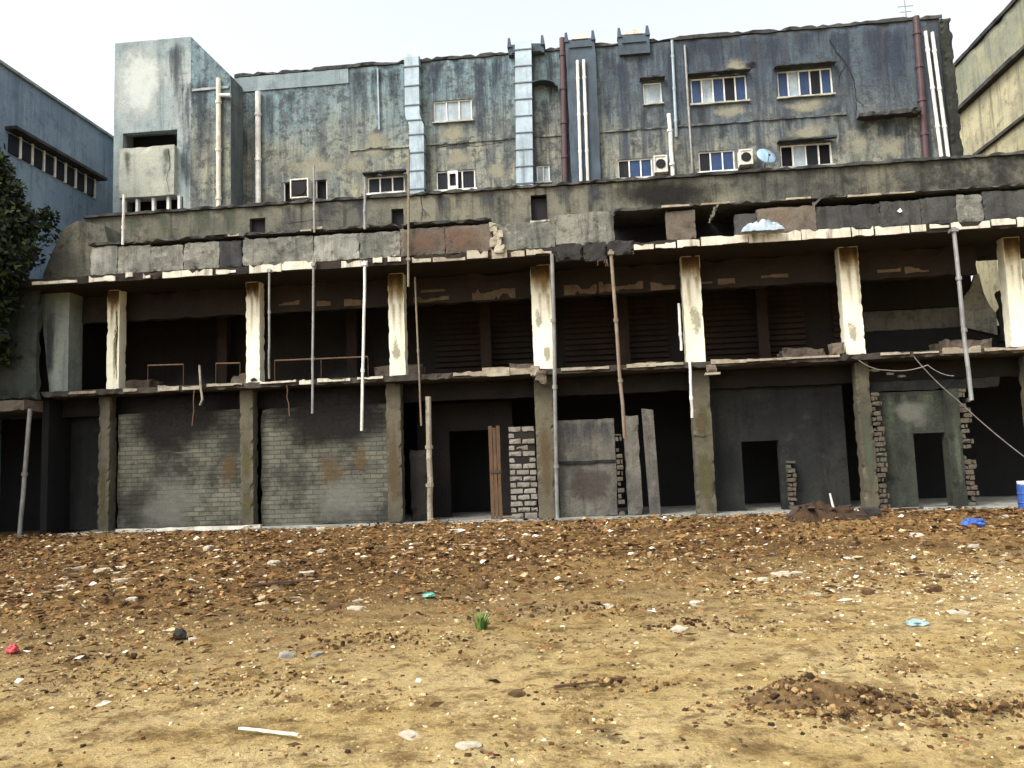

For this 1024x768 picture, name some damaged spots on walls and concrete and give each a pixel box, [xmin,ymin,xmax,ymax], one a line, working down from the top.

leakage [170,46,207,182]
leakage [461,60,498,106]
crack [829,40,865,111]
peeling [341,217,1024,268]